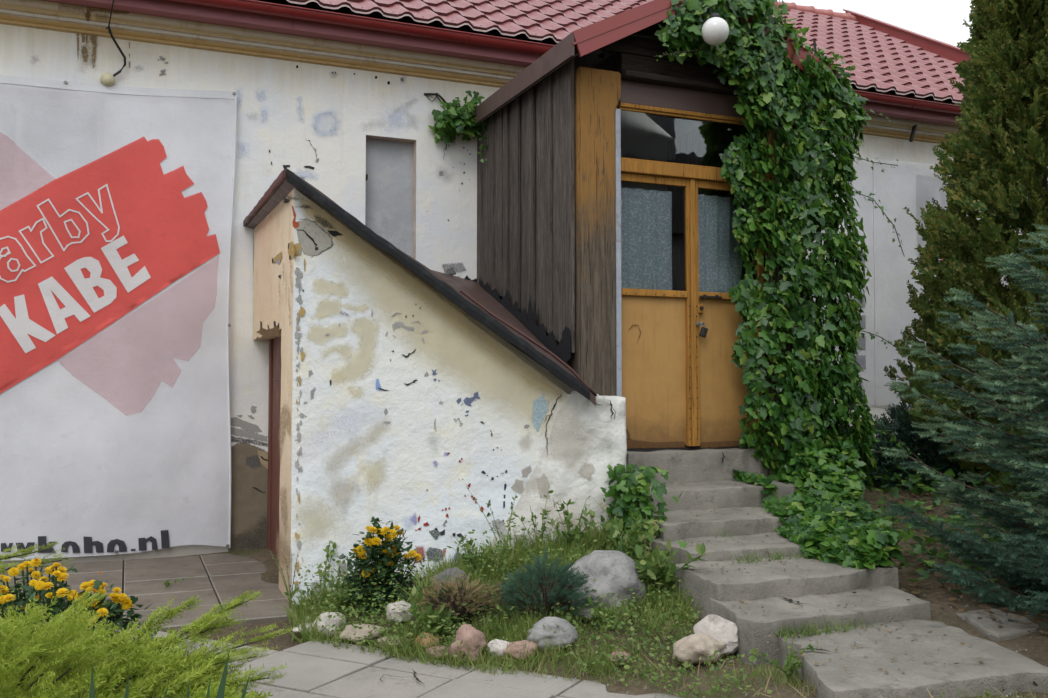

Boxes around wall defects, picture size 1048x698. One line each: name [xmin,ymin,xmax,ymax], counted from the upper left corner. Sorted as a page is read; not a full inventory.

water stain [85,7,129,21]
water stain [77,33,97,67]
peeling [272,206,428,593]
peeling [454,392,480,426]
crack [545,395,561,457]
peeling [228,406,268,552]